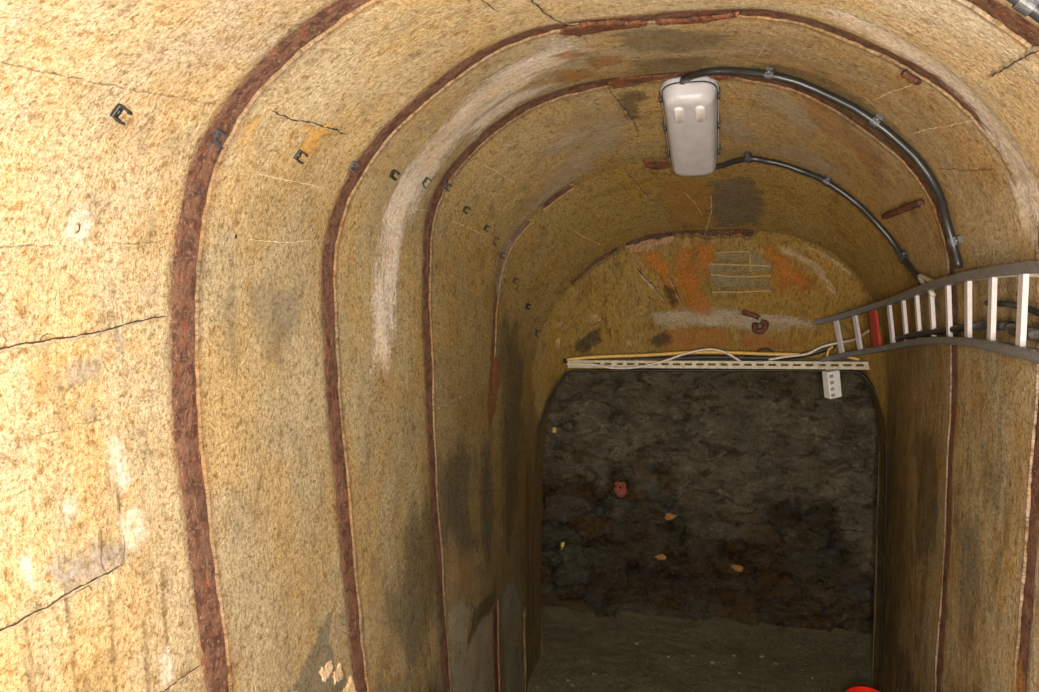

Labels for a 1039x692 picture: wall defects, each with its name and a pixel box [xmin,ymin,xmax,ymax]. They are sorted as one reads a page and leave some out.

crack [528,0,579,25]
crack [0,61,217,105]
crack [271,110,347,135]
efflorescence [370,35,595,375]
crack [0,316,167,354]
corrosion [742,310,796,352]
crack [0,532,125,632]
leakage [160,656,173,684]
peeling [319,660,357,692]